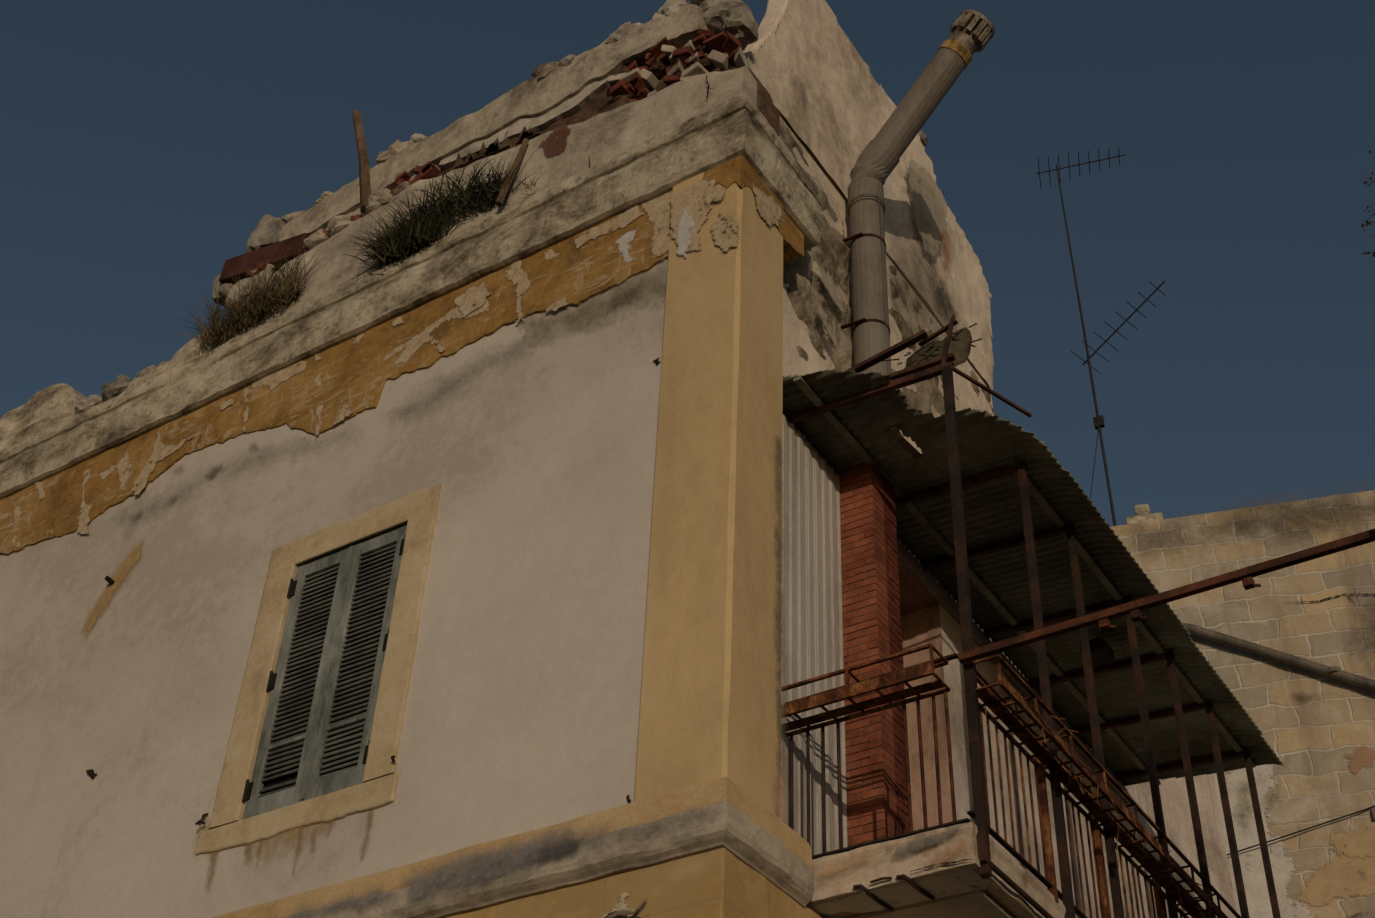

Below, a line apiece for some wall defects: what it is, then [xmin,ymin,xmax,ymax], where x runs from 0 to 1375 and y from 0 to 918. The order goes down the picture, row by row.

spalling [438,28,749,177]
peeling [573,177,740,263]
peeling [382,282,492,365]
peeling [505,260,530,323]
peeling [546,297,569,312]
peeling [219,353,323,432]
peeling [314,403,353,440]
peeling [76,429,192,534]
crack [1283,593,1375,603]
leakage [404,828,602,900]
spalling [602,891,641,918]
spalling [809,859,991,915]